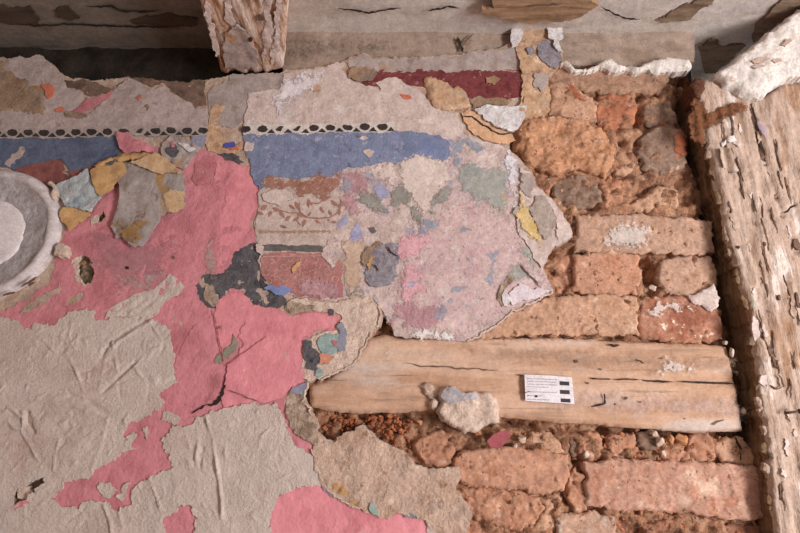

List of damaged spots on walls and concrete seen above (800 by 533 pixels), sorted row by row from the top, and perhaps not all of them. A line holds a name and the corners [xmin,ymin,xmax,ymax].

crack [338,7,399,15]
spalling [547,27,692,78]
spalling [513,168,572,267]
efflorescence [600,222,655,249]
peeling [0,28,527,533]
spalling [497,275,549,307]
efflorescence [649,301,697,316]
crack [191,316,267,414]